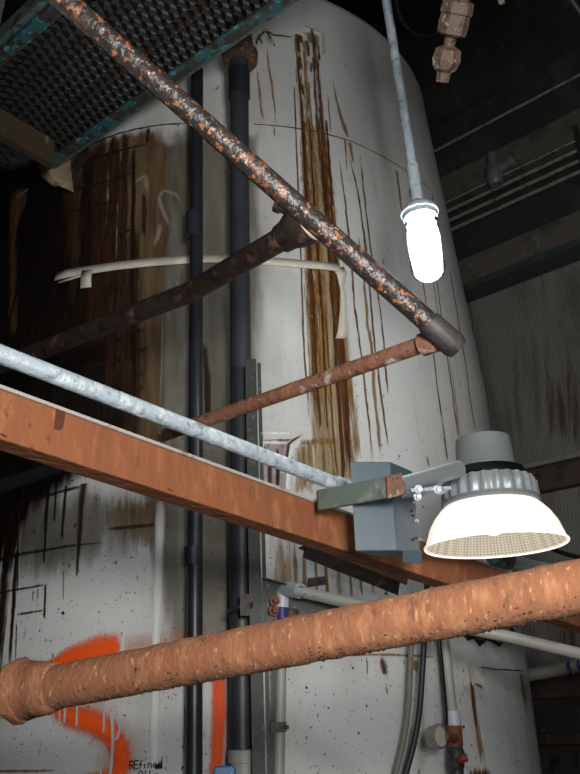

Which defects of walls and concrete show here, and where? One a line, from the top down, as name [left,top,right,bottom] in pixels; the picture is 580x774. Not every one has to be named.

damp [61,123,190,326]
damp [203,142,230,272]
corrosion [254,29,410,258]
damp [83,324,145,398]
damp [161,304,189,418]
damp [203,282,230,414]
corrosion [300,241,349,377]
corrosion [297,366,388,478]
corrosion [351,270,385,357]
damp [0,477,99,661]
damp [149,497,187,639]
damp [203,514,230,635]